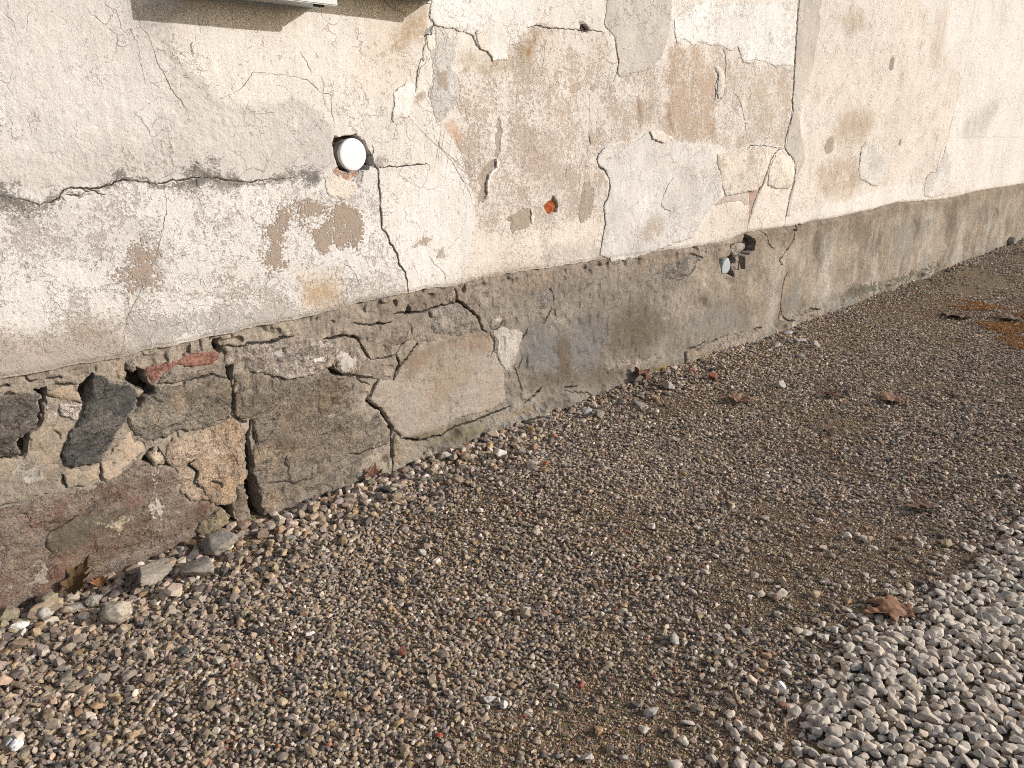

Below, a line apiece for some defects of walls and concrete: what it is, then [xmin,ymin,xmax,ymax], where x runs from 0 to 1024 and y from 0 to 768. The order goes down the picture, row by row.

peeling [392,26,460,123]
crack [0,176,303,262]
peeling [250,168,371,279]
peeling [411,230,446,261]
crack [324,2,592,472]
spalling [477,118,501,202]
spalling [506,198,556,233]
spalling [577,183,593,223]
crack [587,97,610,254]
peeling [650,131,673,143]
peeling [715,173,767,220]
crack [713,0,821,329]